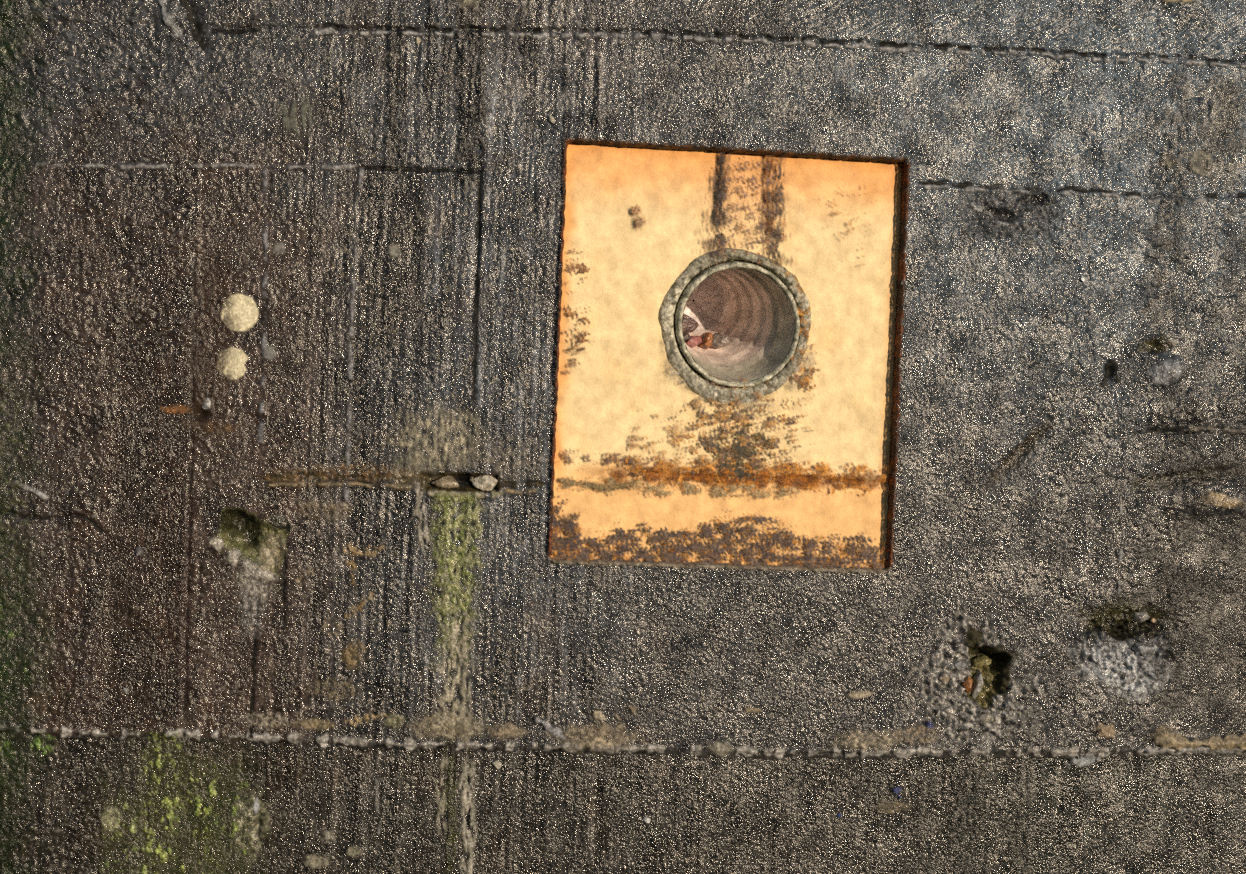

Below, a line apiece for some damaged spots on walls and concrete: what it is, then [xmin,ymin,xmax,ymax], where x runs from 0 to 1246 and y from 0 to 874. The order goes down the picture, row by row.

corrosion [549,138,911,574]
hole [209,508,291,636]
spalling [909,610,1041,748]
spalling [1077,594,1180,701]